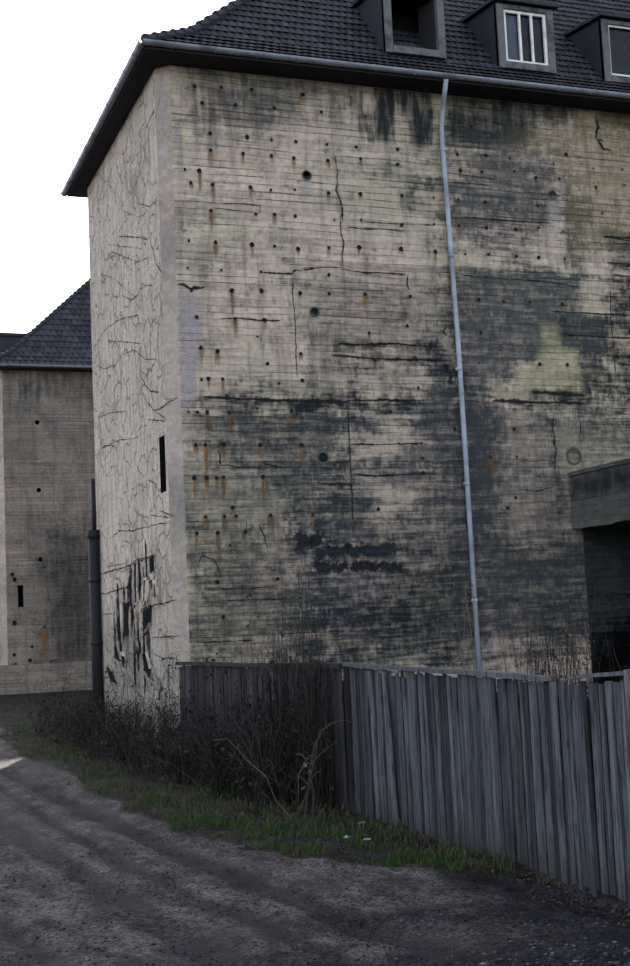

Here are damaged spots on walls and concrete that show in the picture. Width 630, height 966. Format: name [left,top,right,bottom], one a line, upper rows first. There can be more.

water stain [192,68,321,120]
crack [595,118,611,151]
crack [217,156,428,370]
crack [98,178,204,472]
crack [333,341,452,371]
water stain [228,88,630,670]
rust [192,443,226,494]
crack [203,396,421,532]
crack [109,470,173,539]
crack [100,555,178,615]
crack [199,555,288,601]
crack [150,635,251,680]